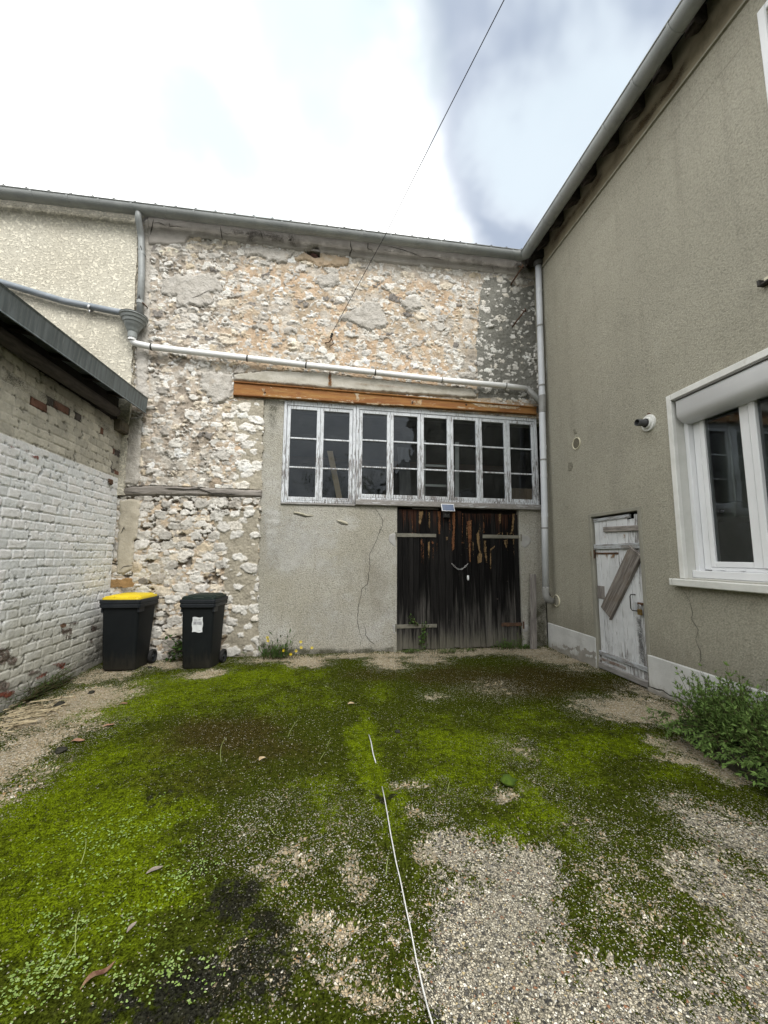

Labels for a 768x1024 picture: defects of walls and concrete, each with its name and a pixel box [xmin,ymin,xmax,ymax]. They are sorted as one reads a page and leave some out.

crack [357,508,384,645]
crack [648,578,705,702]